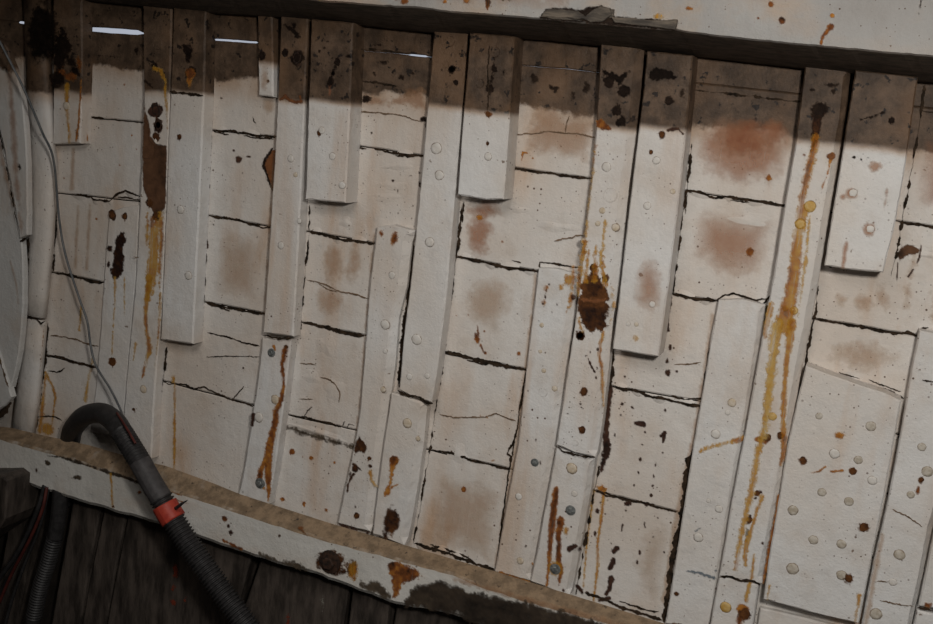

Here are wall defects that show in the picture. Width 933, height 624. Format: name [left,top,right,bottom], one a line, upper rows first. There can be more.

leakage [27,0,80,88]
leakage [711,124,780,181]
corrosion [106,232,126,367]
corrosion [256,345,288,501]
crack [204,205,374,357]
crack [397,245,526,571]
crack [451,201,584,301]
corrosion [560,220,616,406]
crack [609,302,710,408]
corrosion [699,102,835,624]
corrosion [546,486,568,586]
crack [556,432,696,622]